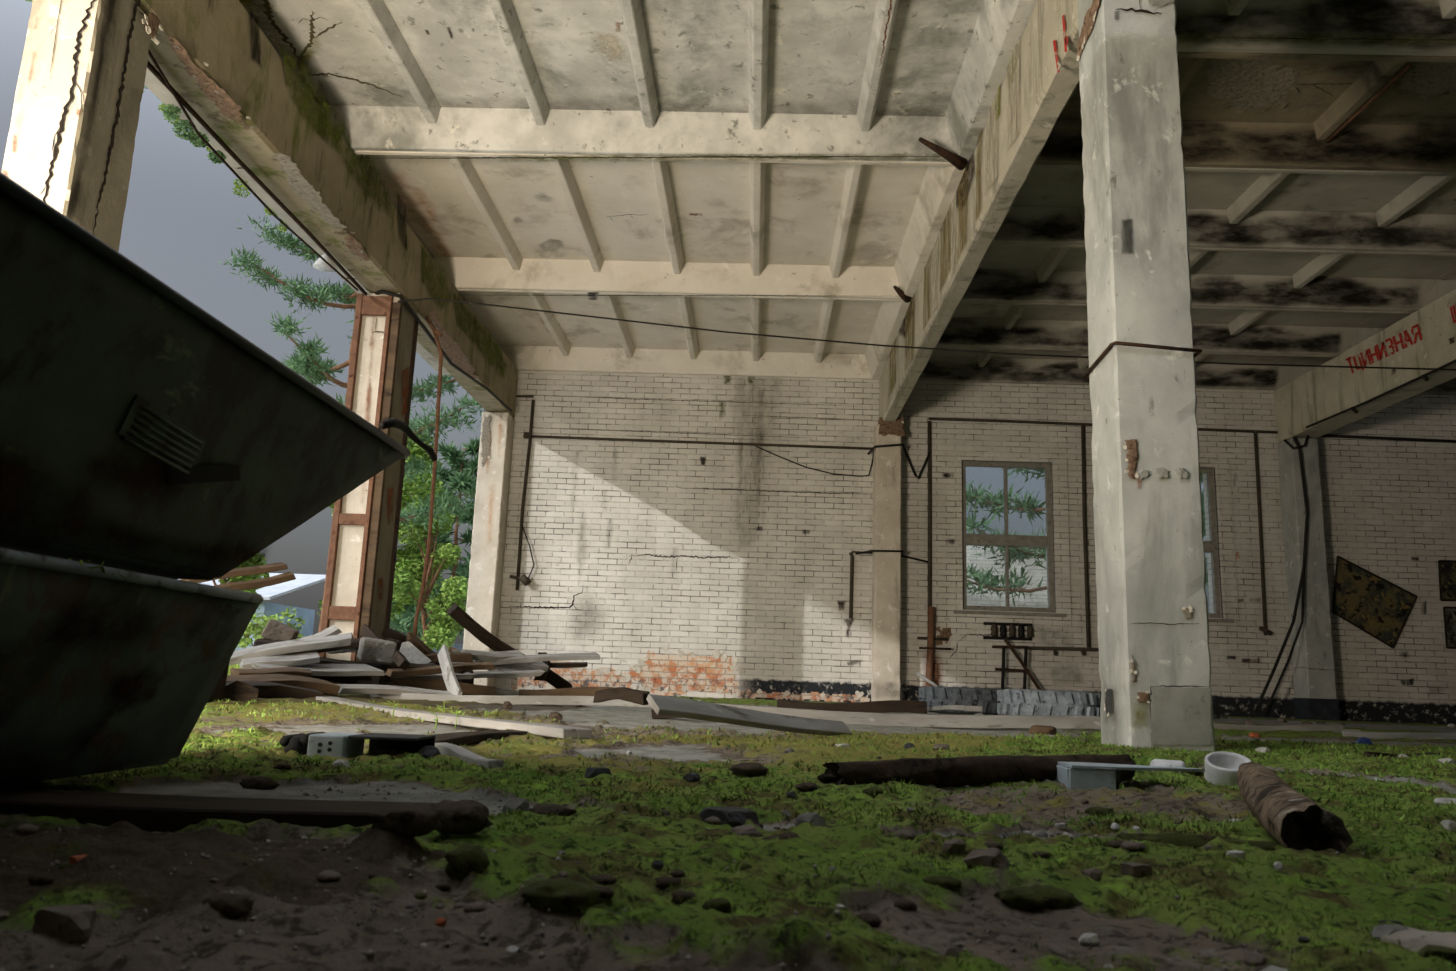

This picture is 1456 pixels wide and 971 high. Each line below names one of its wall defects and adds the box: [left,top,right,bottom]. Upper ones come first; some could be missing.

crack [262,0,400,103]
crack [39,0,145,235]
peeling [273,153,370,269]
flaking render [511,645,870,702]